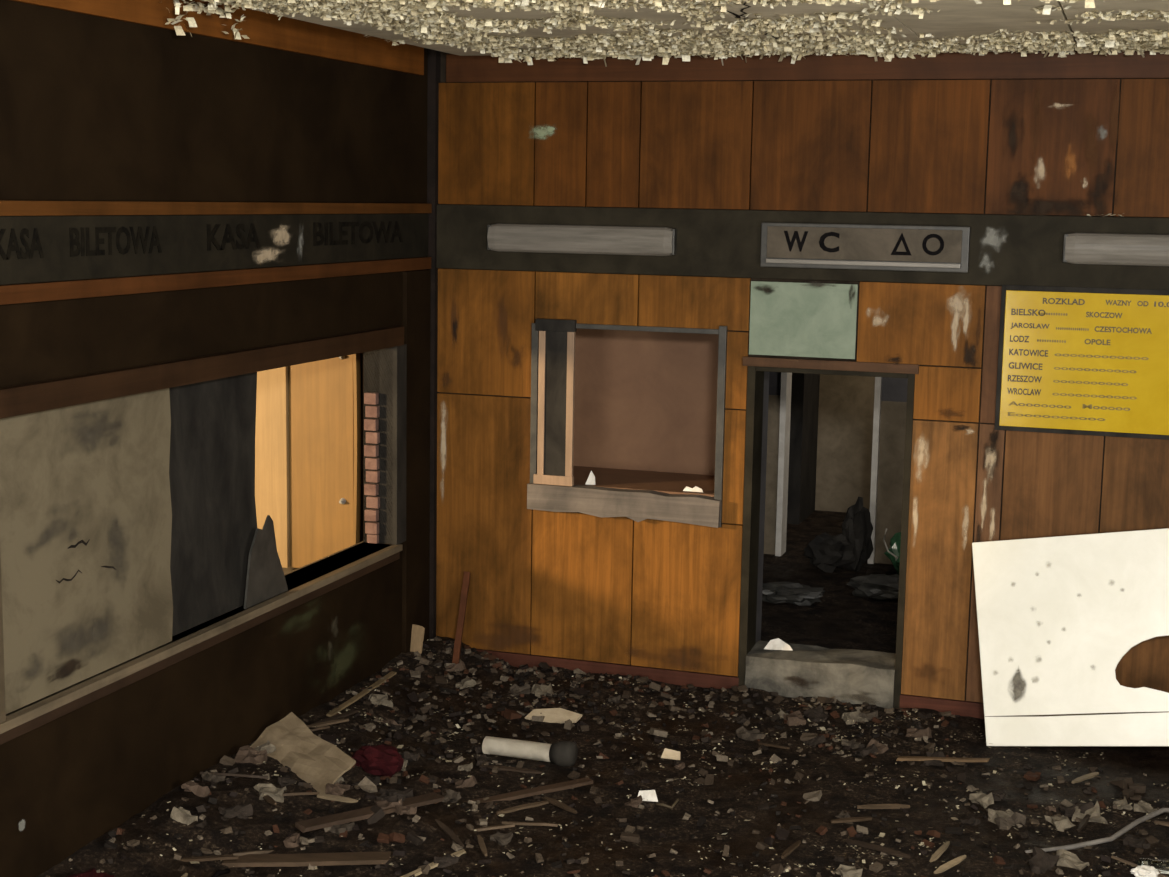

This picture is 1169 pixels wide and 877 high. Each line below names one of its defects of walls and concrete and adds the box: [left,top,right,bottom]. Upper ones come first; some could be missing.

peeling [160,0,1169,67]
crack [700,2,788,44]
peeling [257,227,302,262]
peeling [918,439,927,475]
peeling [986,432,998,466]
peeling [963,481,995,542]